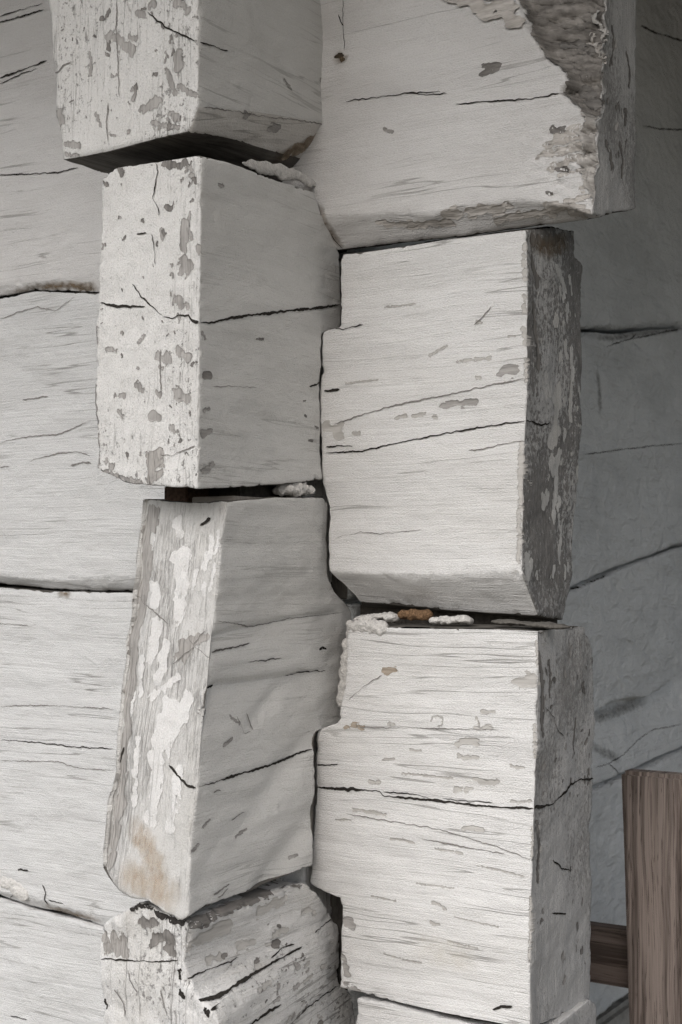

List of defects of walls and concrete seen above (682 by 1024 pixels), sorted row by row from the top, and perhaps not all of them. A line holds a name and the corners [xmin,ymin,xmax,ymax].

peeling [125,0,200,131]
crack [347,91,564,105]
spalling [375,0,633,230]
peeling [161,158,206,279]
peeling [95,367,210,485]
peeling [154,292,213,380]
crack [101,284,363,330]
crack [309,382,339,392]
crack [327,378,550,453]
peeling [108,504,221,871]
crack [169,724,681,871]
peeling [130,879,361,1024]